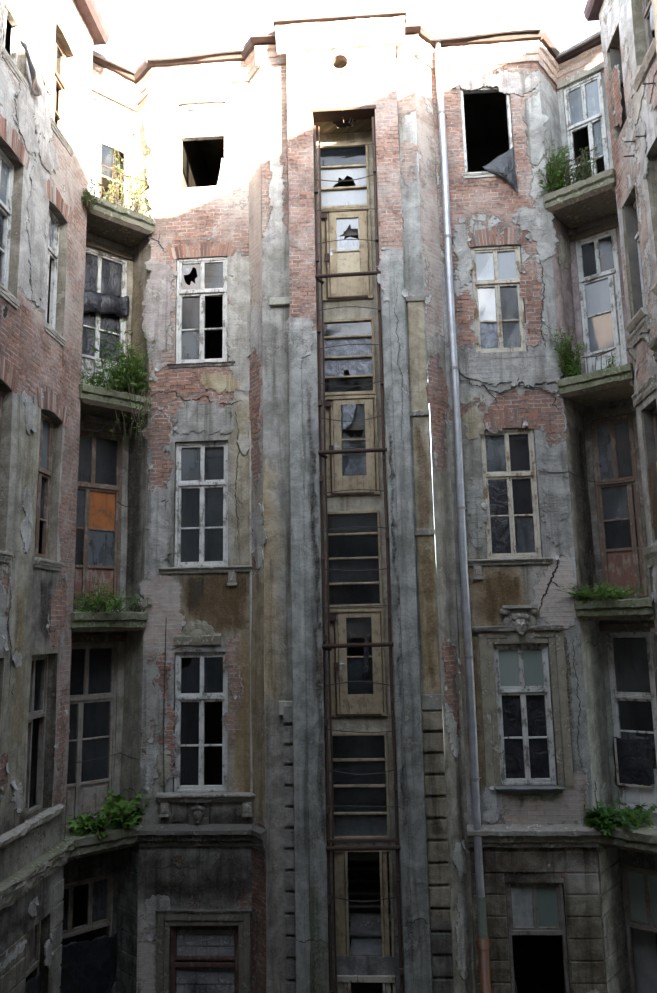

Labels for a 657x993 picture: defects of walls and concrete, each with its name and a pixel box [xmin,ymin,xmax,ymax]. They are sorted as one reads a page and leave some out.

peeling [36,15,56,95]
peeling [14,81,60,307]
peeling [134,84,220,247]
peeling [450,69,550,166]
peeling [141,259,263,494]
peeling [453,207,578,630]
peeling [0,584,22,668]
water stain [188,579,246,627]
crack [539,554,562,609]
peeling [452,839,469,877]
spalling [138,894,170,993]
peeling [455,893,470,980]